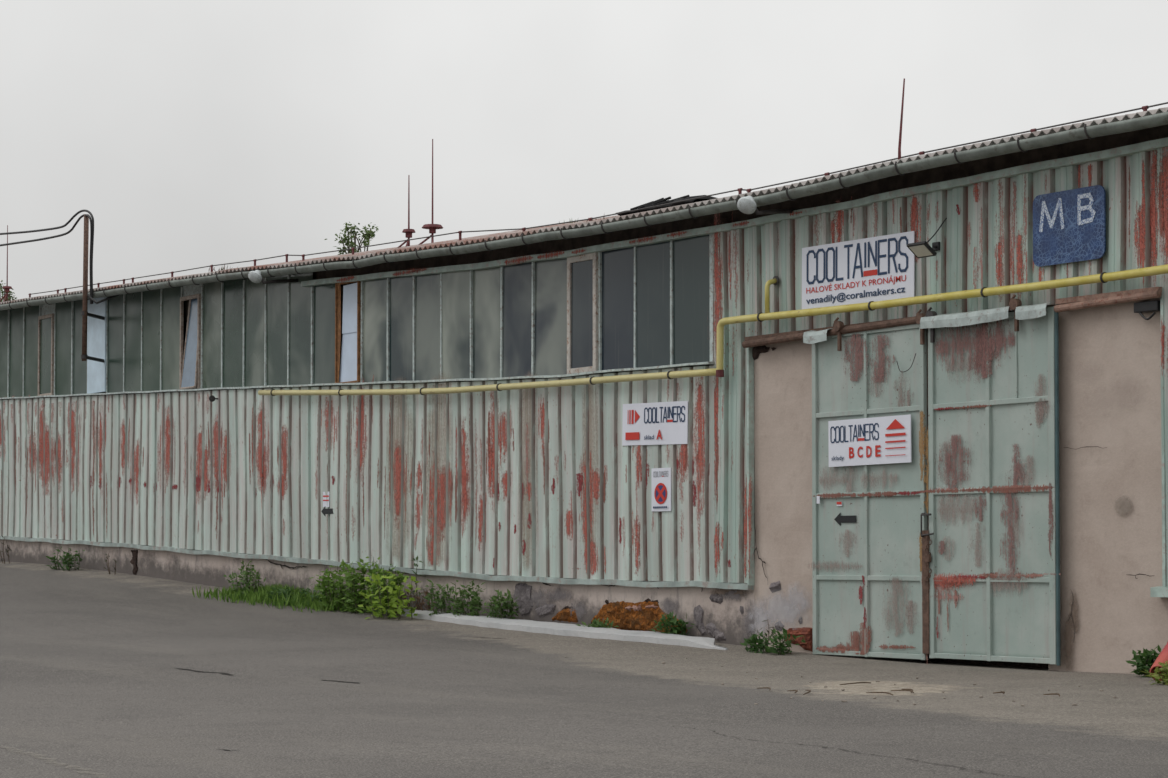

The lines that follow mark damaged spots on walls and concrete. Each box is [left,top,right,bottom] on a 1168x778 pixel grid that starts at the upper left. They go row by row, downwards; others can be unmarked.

rust [377,395,413,539]
rust [426,432,458,566]
rust [514,424,532,554]
rust [576,452,607,574]
rust [814,334,1060,591]
flaking render [513,583,726,641]
flaking render [769,581,781,593]
flaking render [775,616,813,652]
rust [817,623,928,664]